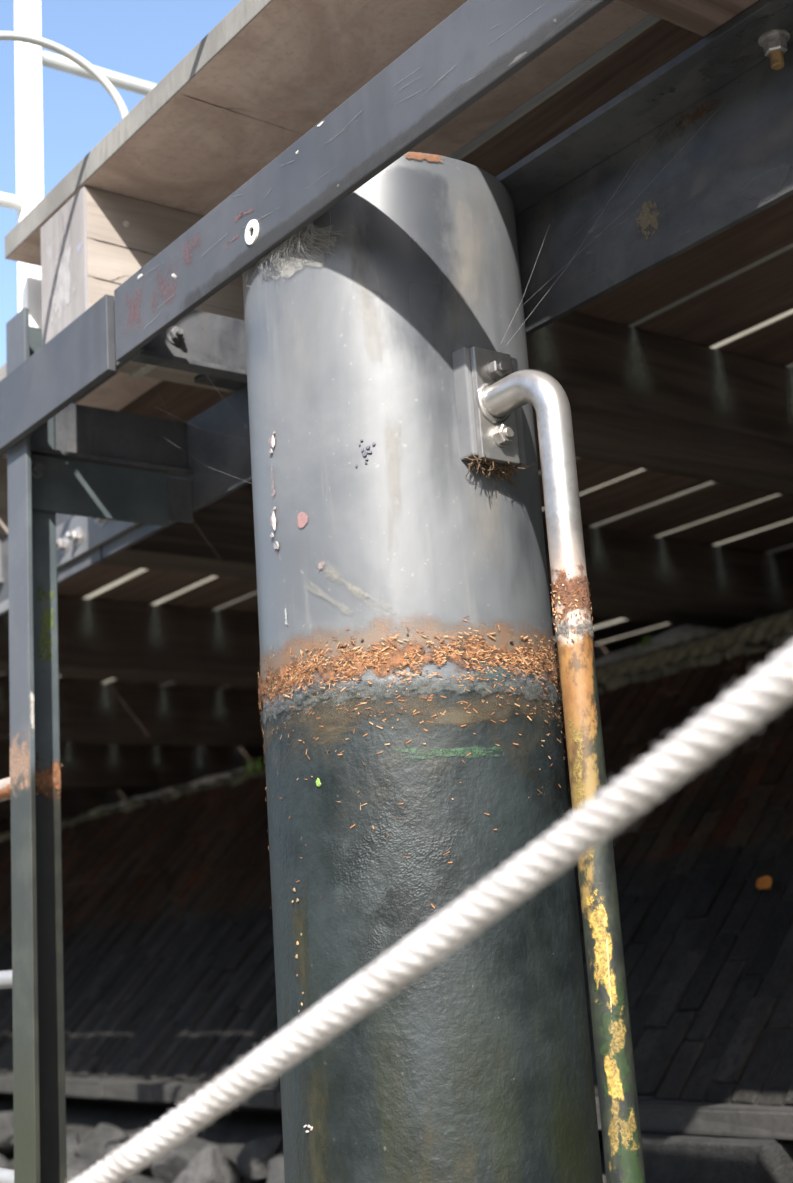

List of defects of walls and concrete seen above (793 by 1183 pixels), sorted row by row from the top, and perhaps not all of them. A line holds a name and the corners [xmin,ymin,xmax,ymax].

rust [0,734,63,801]
rust [258,564,594,766]
peeling [568,718,585,812]
peeling [586,889,644,1183]